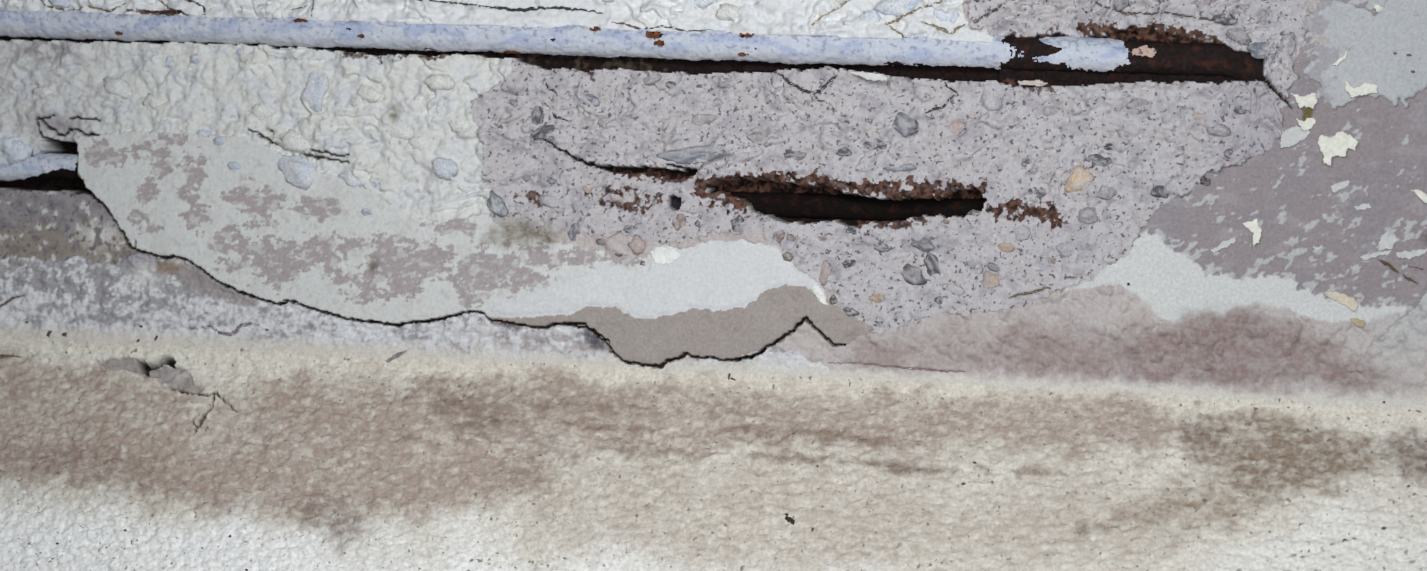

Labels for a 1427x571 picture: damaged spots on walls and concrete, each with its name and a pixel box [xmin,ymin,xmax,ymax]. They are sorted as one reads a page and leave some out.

corrosion [1076,11,1235,51]
crack [37,116,101,140]
crack [248,129,350,163]
crack [545,83,612,170]
spalling [0,0,1427,335]
corrosion [584,165,1063,229]
corrosion [848,216,927,236]
crack [55,187,965,373]
crack [172,390,238,435]
damp [0,355,1372,515]
damp [1392,441,1427,472]